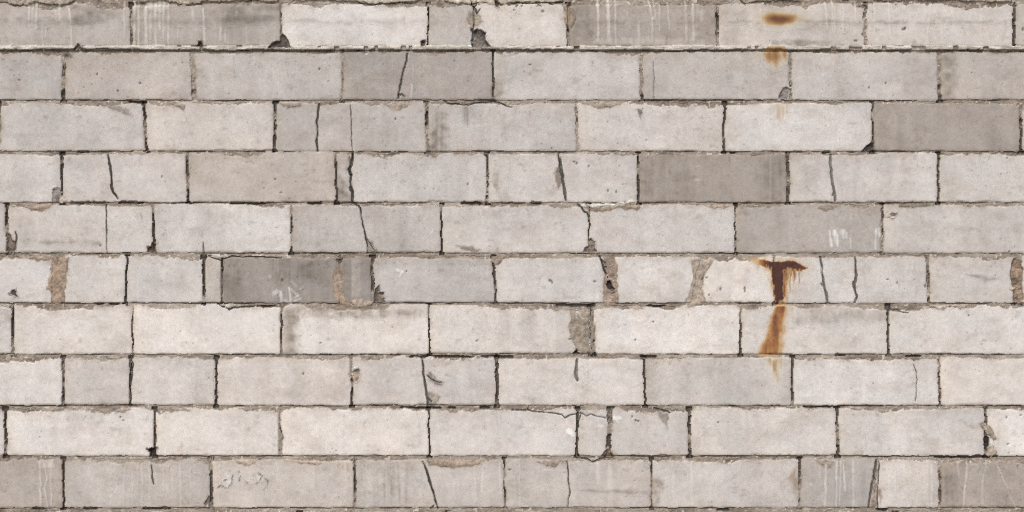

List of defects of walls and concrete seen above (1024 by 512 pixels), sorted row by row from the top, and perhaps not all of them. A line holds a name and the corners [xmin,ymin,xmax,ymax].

spalling [467,28,493,51]
corrosion [743,5,819,73]
crack [398,54,408,99]
crack [105,155,118,250]
crack [348,106,374,253]
crack [558,154,589,217]
crack [820,257,828,302]
crack [851,257,859,301]
spalling [1009,257,1024,305]
corrosion [740,255,819,406]
crack [423,463,438,508]
crack [529,410,604,499]